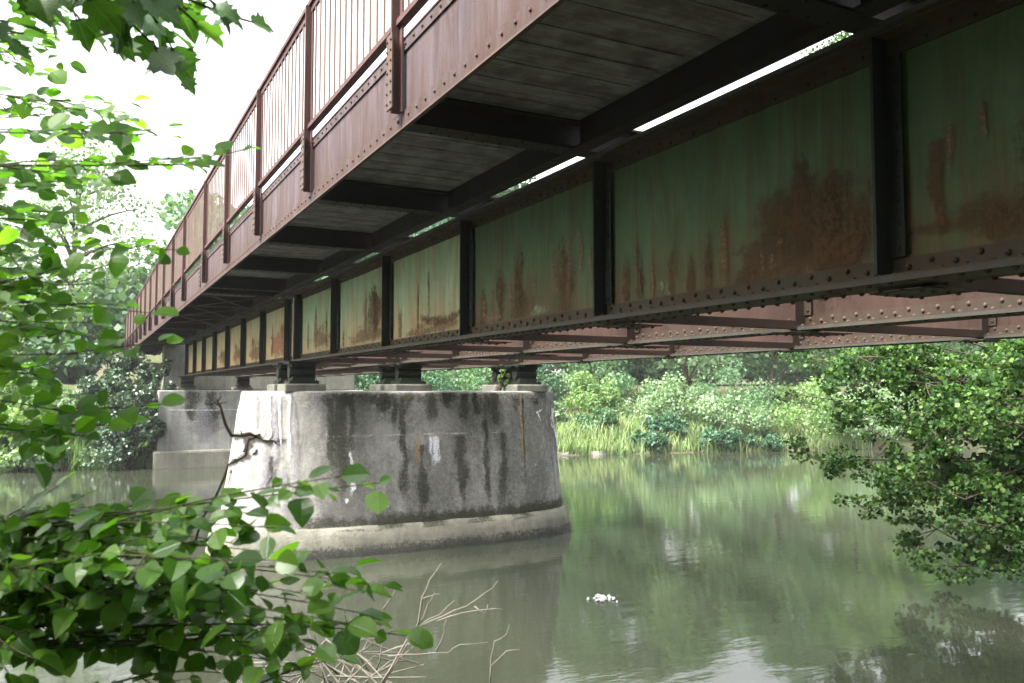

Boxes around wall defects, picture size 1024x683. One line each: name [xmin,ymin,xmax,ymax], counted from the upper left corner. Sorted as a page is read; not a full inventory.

rust [343,287,382,346]
rust [399,272,459,337]
rust [480,254,546,324]
leakage [326,395,356,504]
leakage [377,393,440,509]
leakage [426,393,507,501]